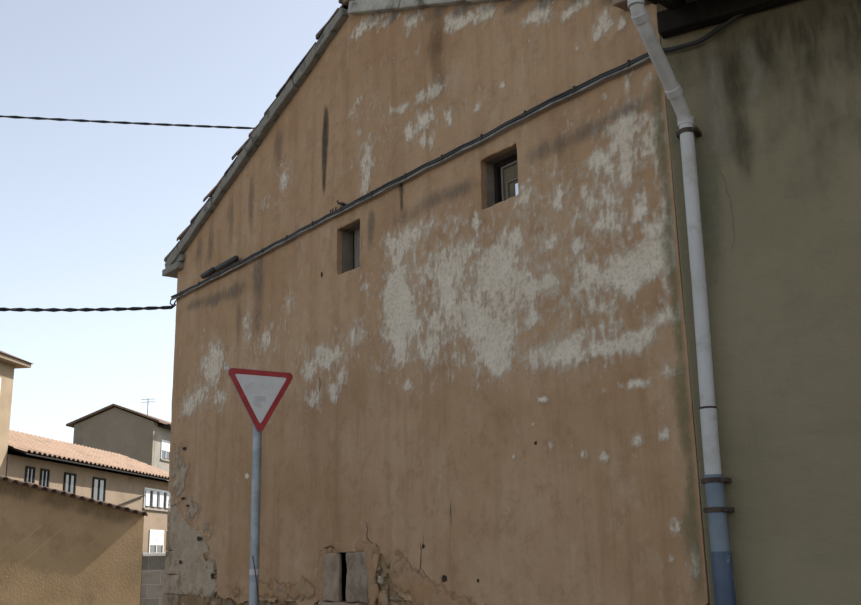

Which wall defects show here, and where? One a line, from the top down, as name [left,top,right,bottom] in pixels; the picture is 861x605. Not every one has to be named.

peeling [351,12,420,40]
peeling [445,1,496,33]
peeling [523,0,554,26]
peeling [561,0,590,21]
peeling [593,0,630,41]
peeling [351,129,375,194]
peeling [376,70,680,387]
peeling [181,340,229,416]
peeling [300,320,365,409]
peeling [628,379,650,389]
flaking render [167,446,297,605]
flaking render [364,554,413,605]